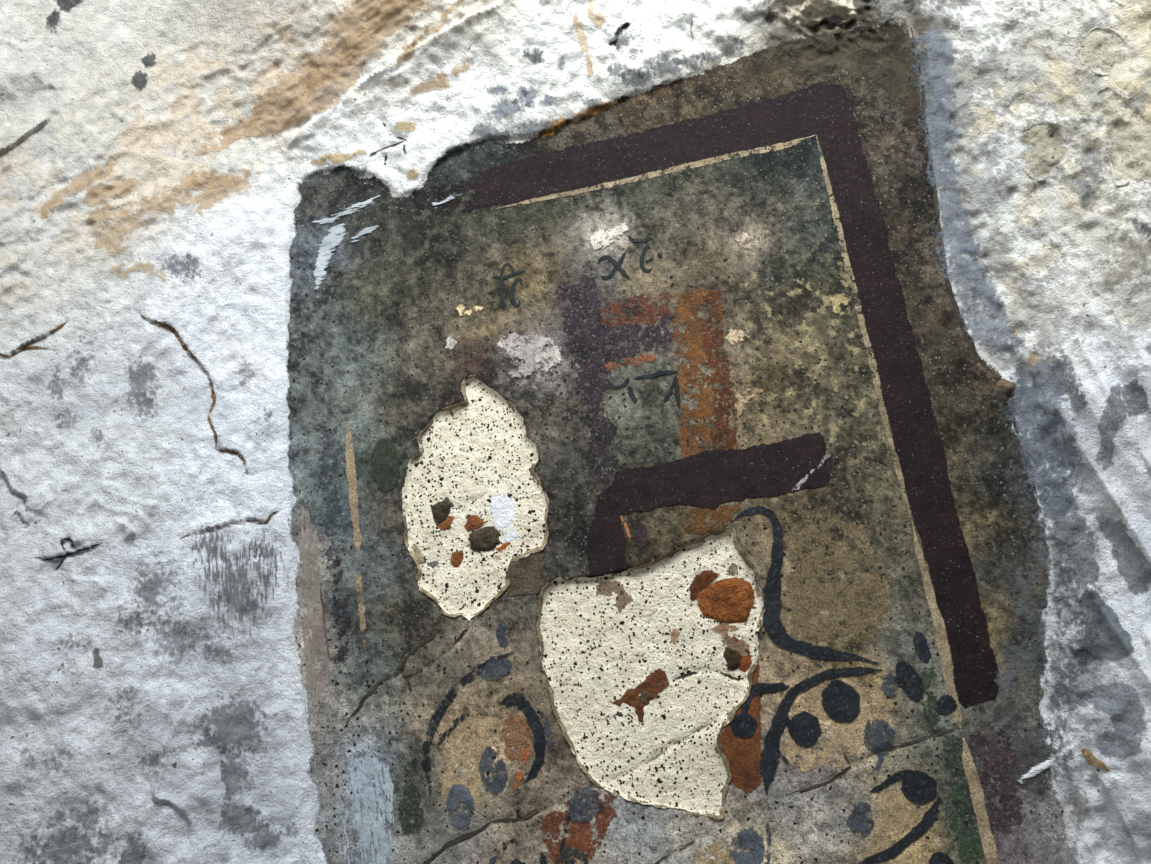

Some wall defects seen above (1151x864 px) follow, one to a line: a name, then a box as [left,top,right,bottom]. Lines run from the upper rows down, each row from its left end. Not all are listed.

crack [0,321,68,358]
crack [140,315,245,462]
crack [35,538,102,569]
spalling [402,374,765,820]